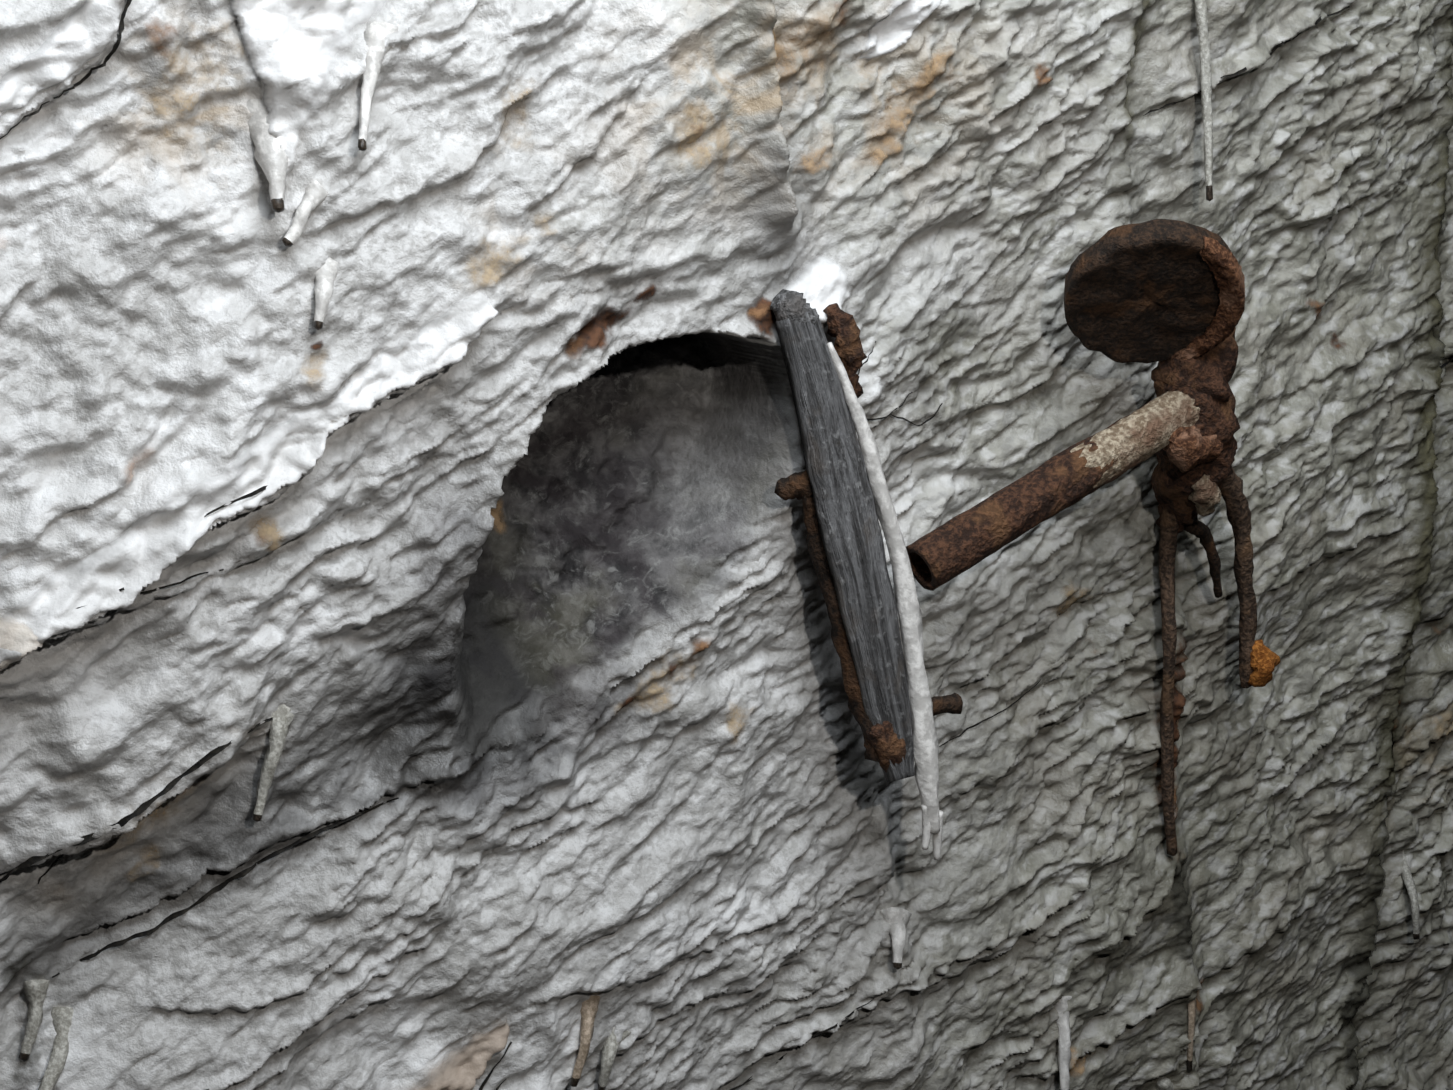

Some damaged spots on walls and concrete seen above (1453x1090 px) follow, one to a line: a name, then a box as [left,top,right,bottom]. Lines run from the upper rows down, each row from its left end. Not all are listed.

crack [0,0,132,139]
crack [1143,6,1350,116]
corrosion [567,285,656,352]
corrosion [1172,236,1245,363]
crack [119,569,224,594]
crack [205,485,268,517]
spalling [451,332,801,757]
corrosion [1152,644,1188,809]
crack [0,717,273,884]
crack [52,797,399,978]
corrosion [1166,864,1193,952]